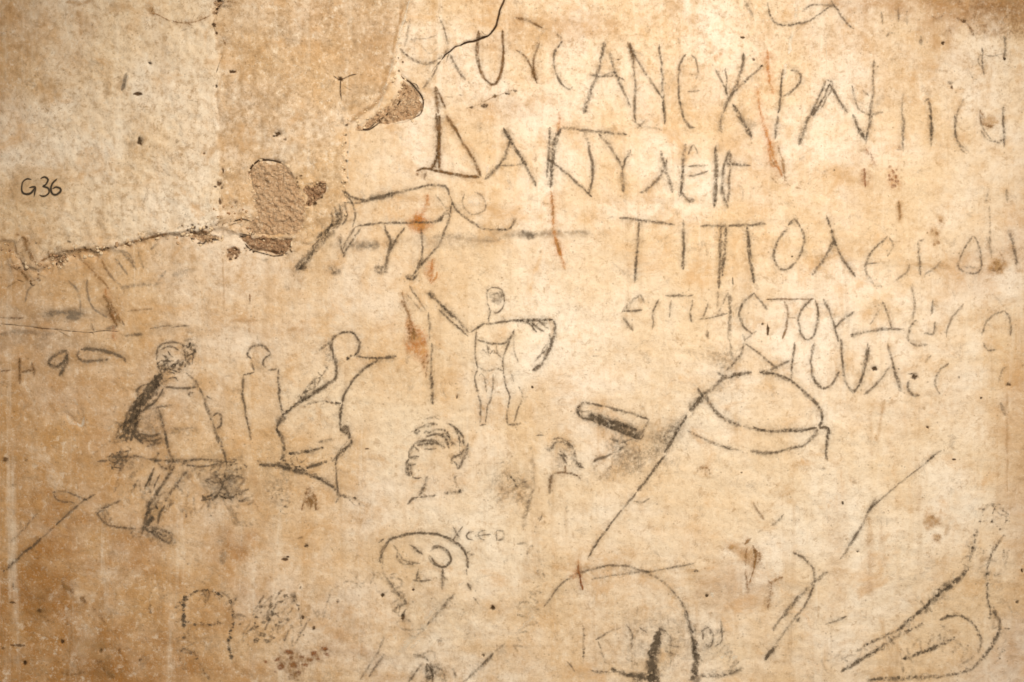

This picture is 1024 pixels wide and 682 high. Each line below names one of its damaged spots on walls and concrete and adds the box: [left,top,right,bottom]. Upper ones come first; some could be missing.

crack [442,0,505,59]
flaking render [341,6,425,216]
flaking render [1,159,326,284]